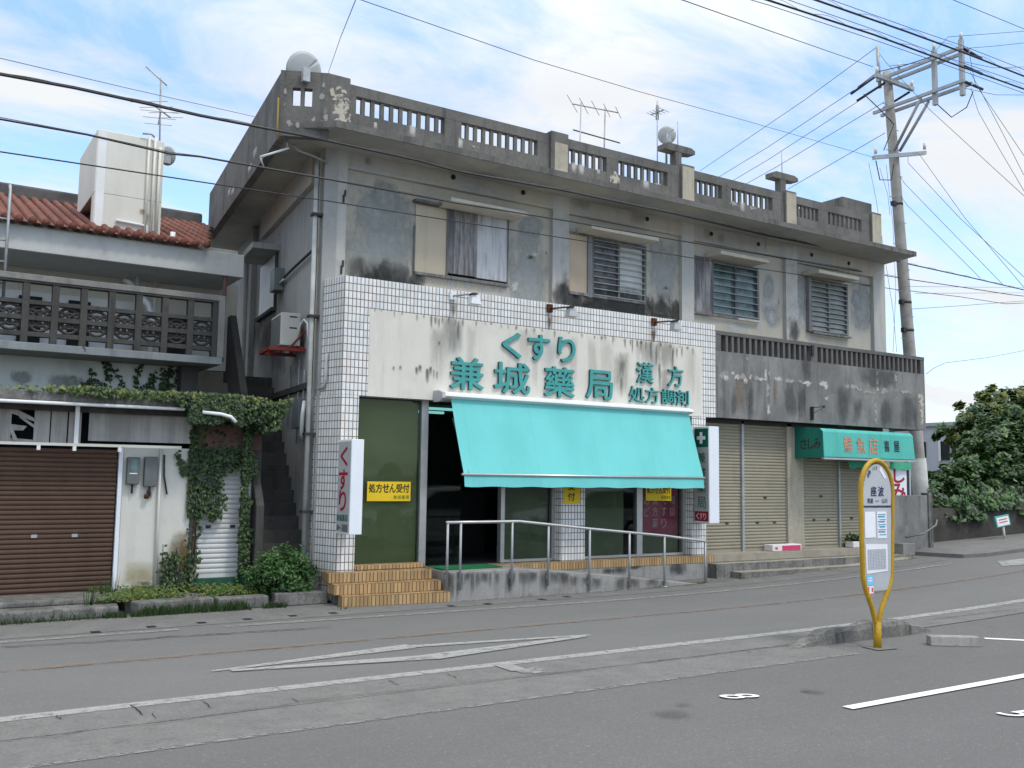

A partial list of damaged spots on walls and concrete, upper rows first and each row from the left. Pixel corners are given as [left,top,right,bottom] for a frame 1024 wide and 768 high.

peeling [287,83,351,128]
damp [353,261,419,285]
damp [718,369,829,414]